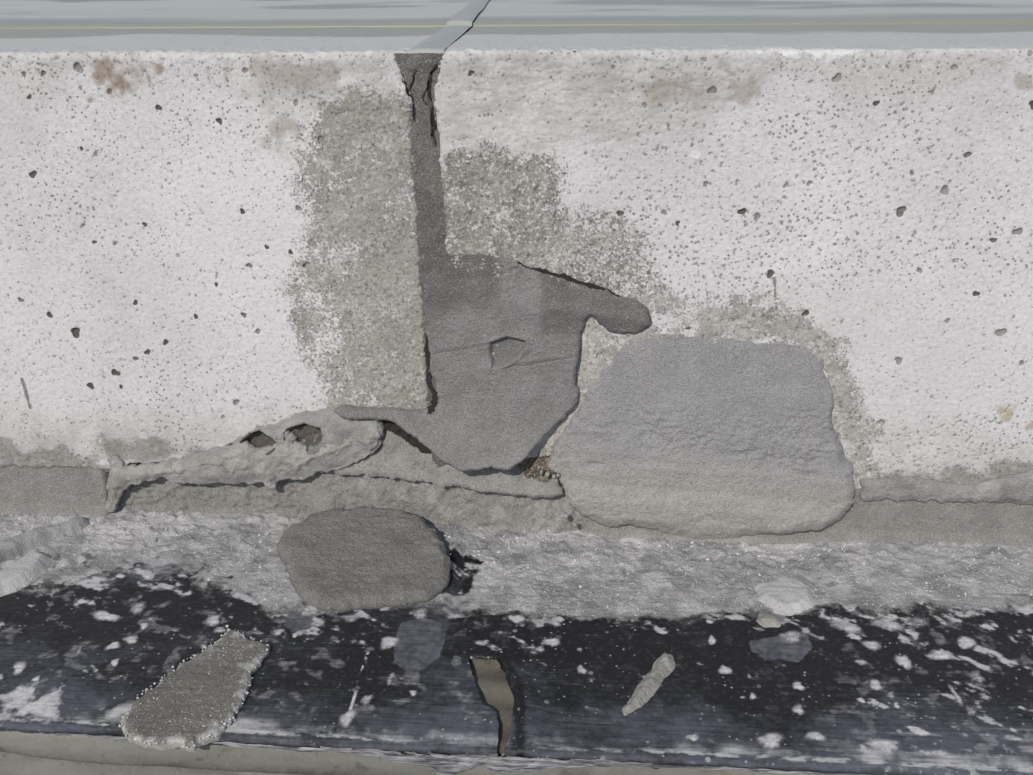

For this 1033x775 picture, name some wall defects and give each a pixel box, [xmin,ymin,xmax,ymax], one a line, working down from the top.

crack [401,67,438,147]
crack [518,262,620,297]
crack [424,333,438,414]